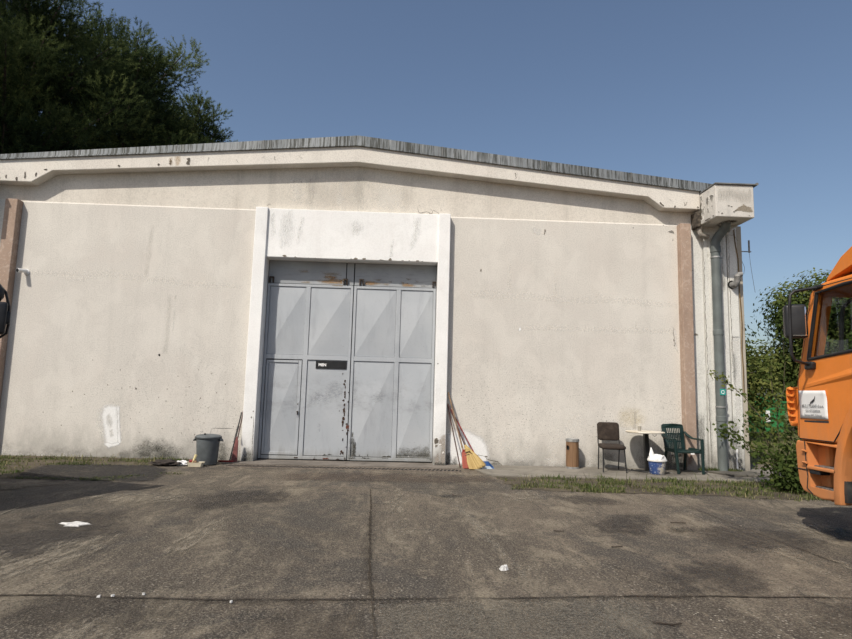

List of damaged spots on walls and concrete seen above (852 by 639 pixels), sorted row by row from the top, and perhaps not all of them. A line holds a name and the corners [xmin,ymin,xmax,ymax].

peeling [697,191,753,226]